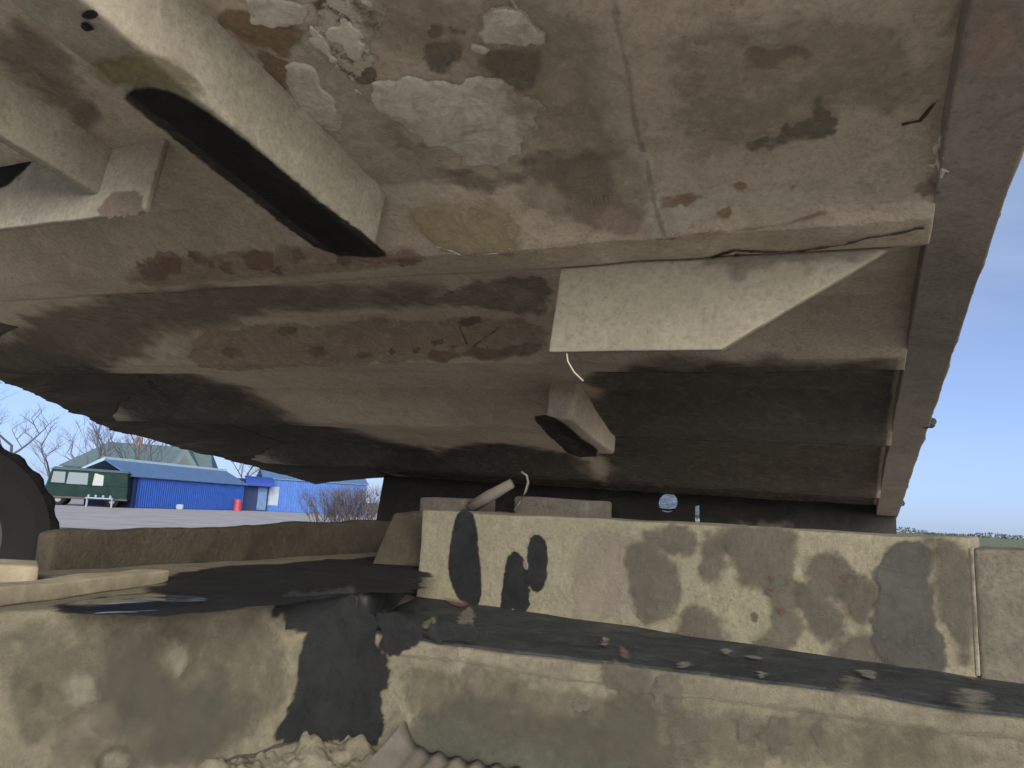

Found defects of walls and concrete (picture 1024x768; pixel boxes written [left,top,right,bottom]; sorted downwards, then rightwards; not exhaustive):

peeling [246,0,547,167]
water stain [424,41,461,74]
water stain [482,0,677,239]
water stain [749,99,838,150]
crack [902,102,936,126]
crack [711,227,924,258]
water stain [0,277,551,374]
water stain [116,358,978,672]
water stain [54,556,480,746]